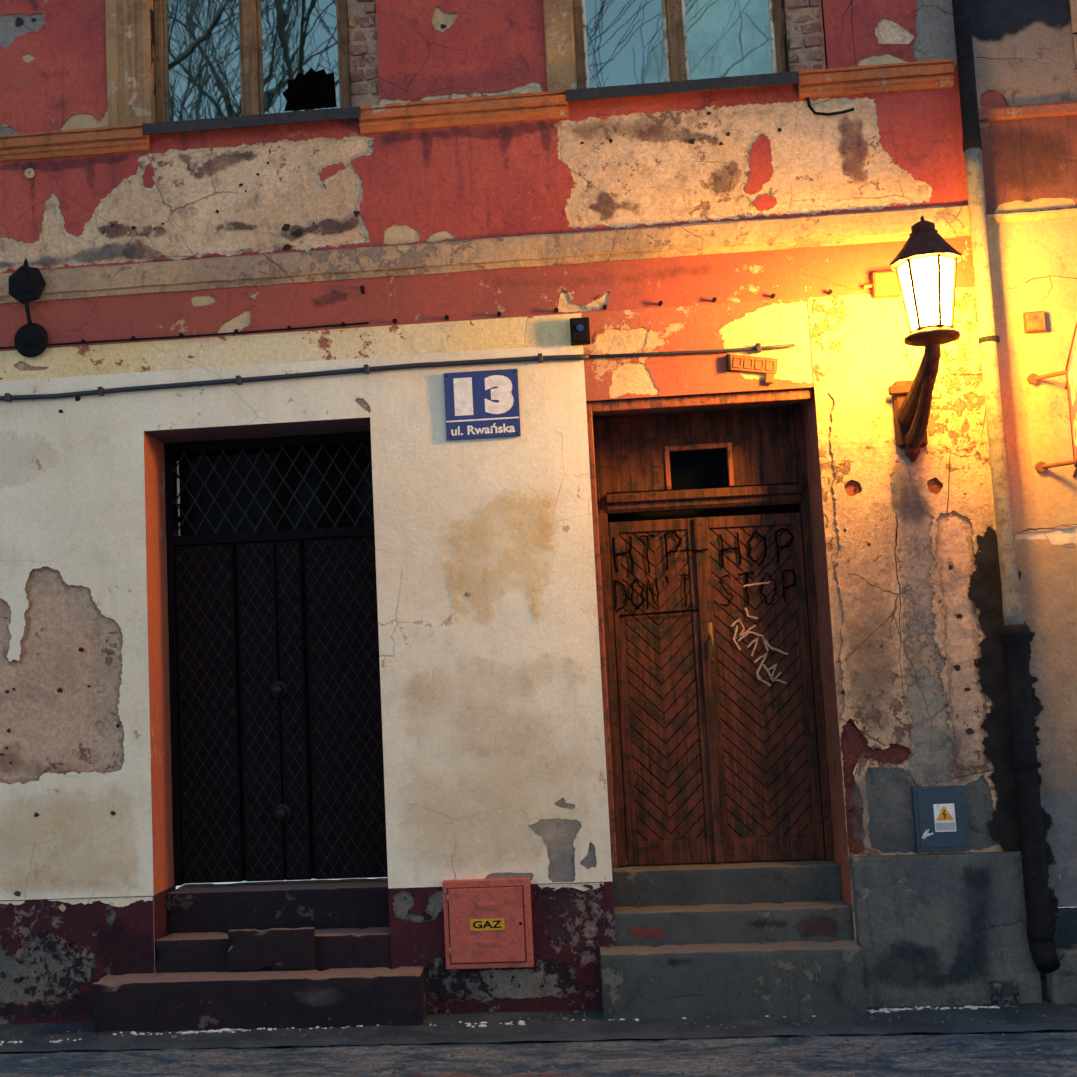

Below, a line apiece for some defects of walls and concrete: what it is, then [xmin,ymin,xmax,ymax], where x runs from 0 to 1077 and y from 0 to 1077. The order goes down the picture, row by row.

flaking render [0,13,45,48]
peeling [858,0,957,66]
peeling [0,135,374,273]
peeling [554,97,932,229]
peeling [719,300,813,383]
flaking render [927,478,943,494]
flaking render [0,566,125,785]
flaking render [826,392,914,855]
flaking render [934,511,989,781]
peeling [0,931,99,1005]
flaking render [48,896,153,926]
peeling [425,798,604,1002]